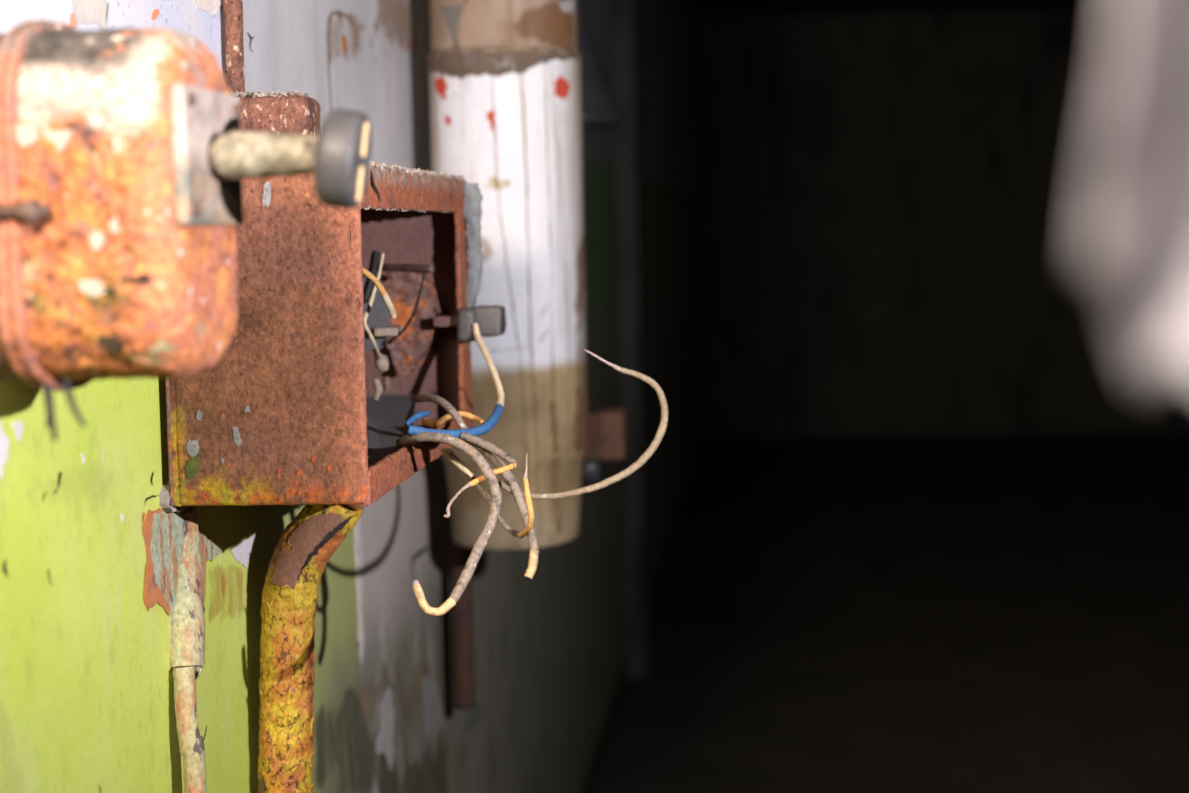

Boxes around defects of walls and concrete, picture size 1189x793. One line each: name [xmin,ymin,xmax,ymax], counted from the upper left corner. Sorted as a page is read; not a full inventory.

peeling [193,0,224,17]
spalling [441,0,467,54]
peeling [0,420,23,479]
peeling [150,512,184,647]
peeling [198,526,256,664]